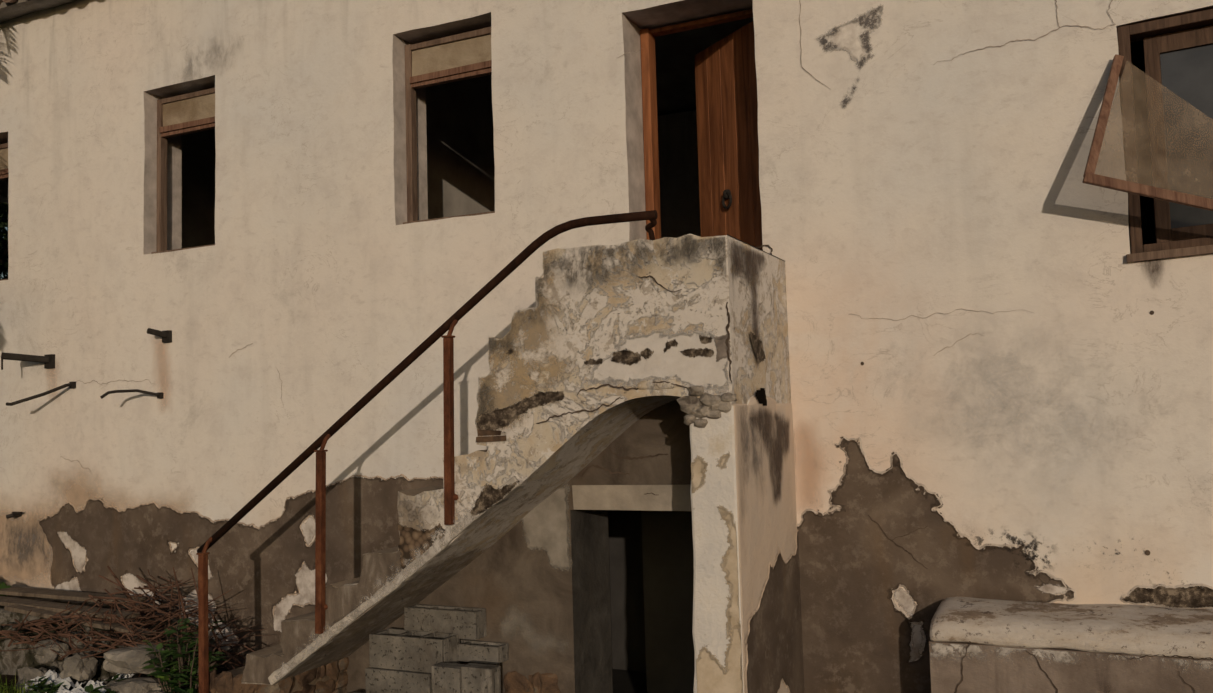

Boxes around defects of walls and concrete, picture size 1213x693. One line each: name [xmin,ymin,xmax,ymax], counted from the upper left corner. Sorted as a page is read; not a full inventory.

crack [799,3,830,89]
crack [937,0,1116,62]
flaking render [584,334,731,365]
flaking render [477,391,564,431]
spalling [677,385,737,428]
water stain [743,409,789,500]
peeling [39,474,443,684]
peeling [691,436,1078,693]
flaking render [1120,583,1213,609]
crack [955,641,971,693]
crack [1025,650,1058,693]
crack [1108,654,1212,693]